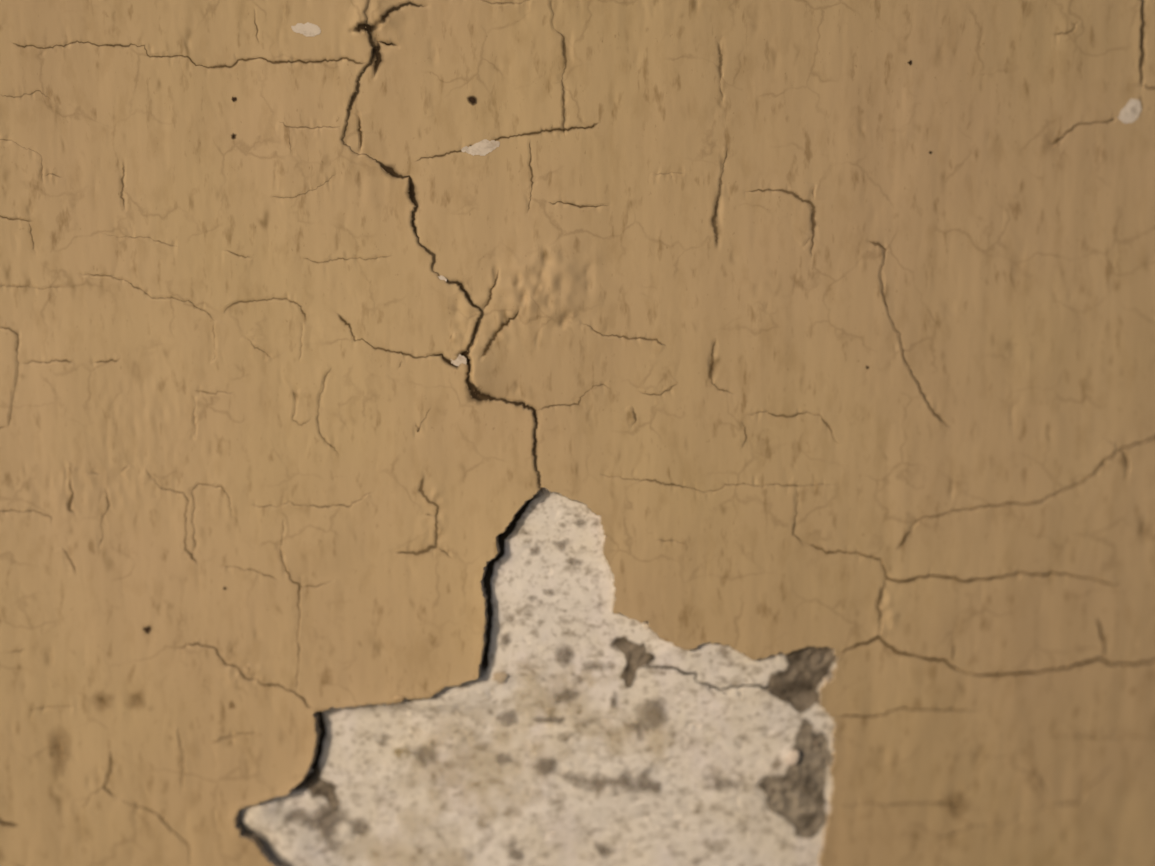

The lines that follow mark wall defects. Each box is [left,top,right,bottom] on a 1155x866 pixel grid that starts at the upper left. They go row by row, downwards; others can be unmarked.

crack [1140,0,1155,89]
crack [1056,119,1113,141]
crack [18,2,595,491]
crack [754,190,815,246]
crack [403,481,439,554]
crack [792,524,1155,676]
crack [190,643,305,701]
peeling [235,487,839,866]
crack [643,666,767,695]